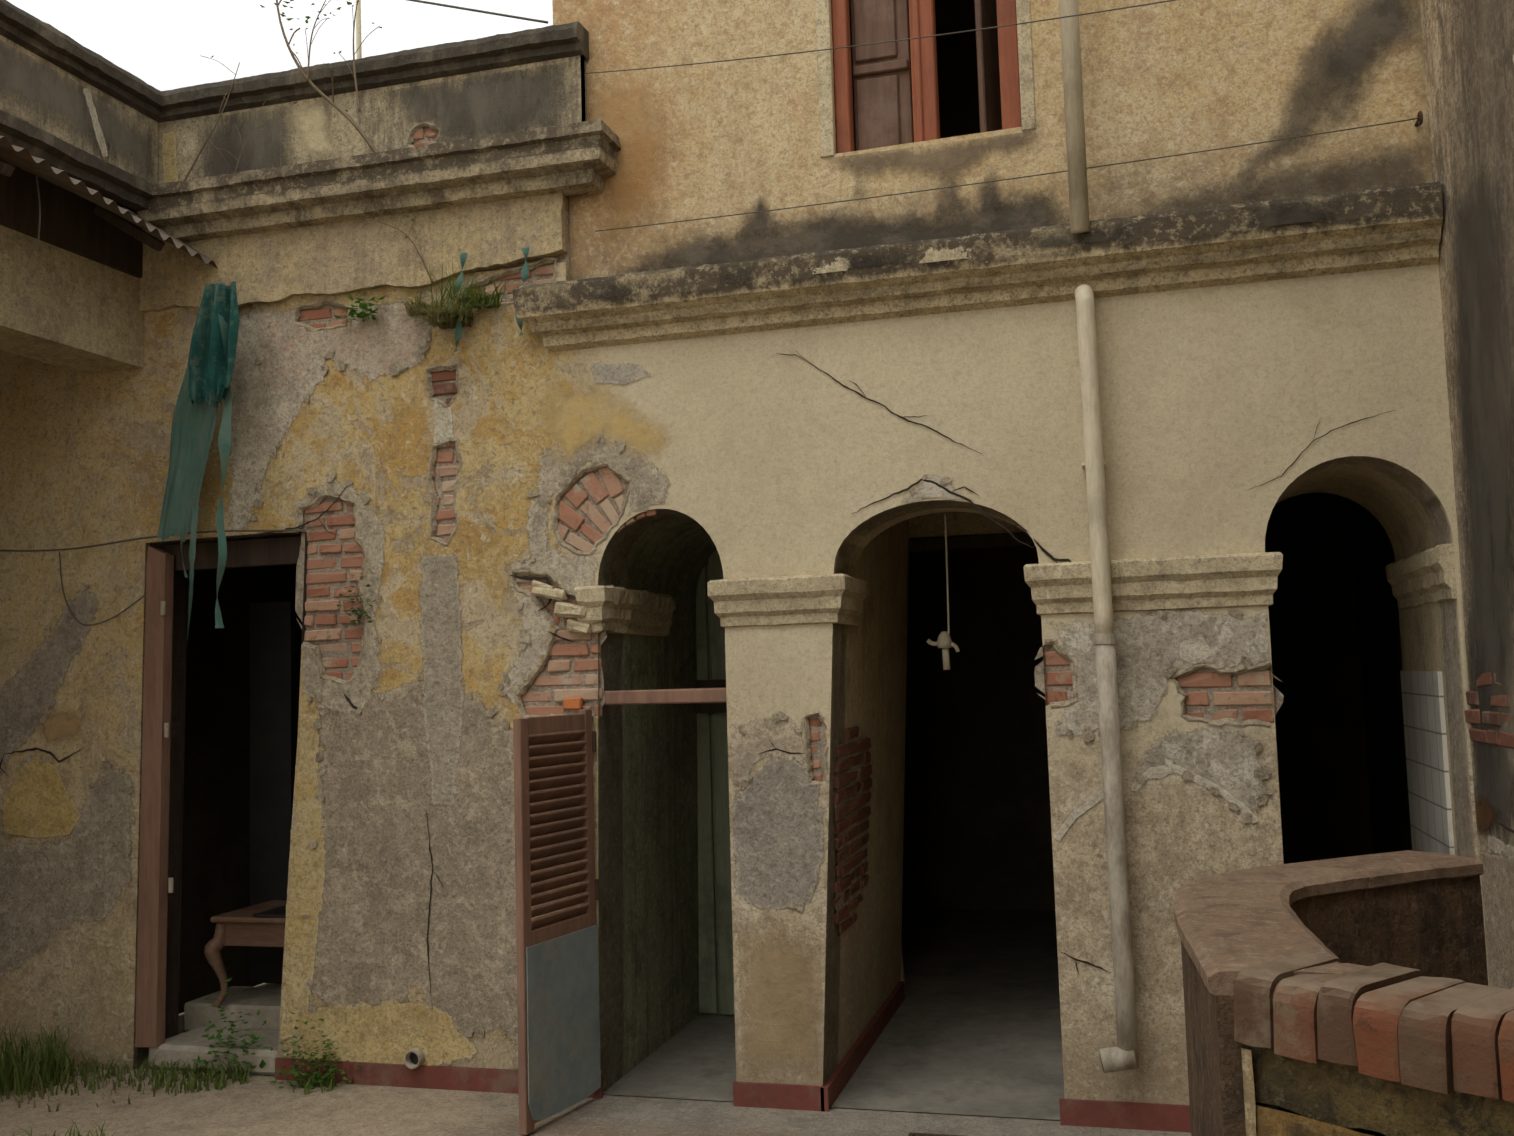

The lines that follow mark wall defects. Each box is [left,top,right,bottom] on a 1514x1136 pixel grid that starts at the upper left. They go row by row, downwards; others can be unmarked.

peeling [227,296,460,530]
peeling [591,363,651,385]
crack [782,350,982,454]
crack [852,478,1071,563]
crack [1246,410,1395,491]
damp [1453,171,1514,843]
flaking render [0,583,98,780]
flaking render [281,434,671,1069]
flaking render [730,711,872,936]
flaking render [1034,619,1100,742]
flaking render [1113,609,1284,823]